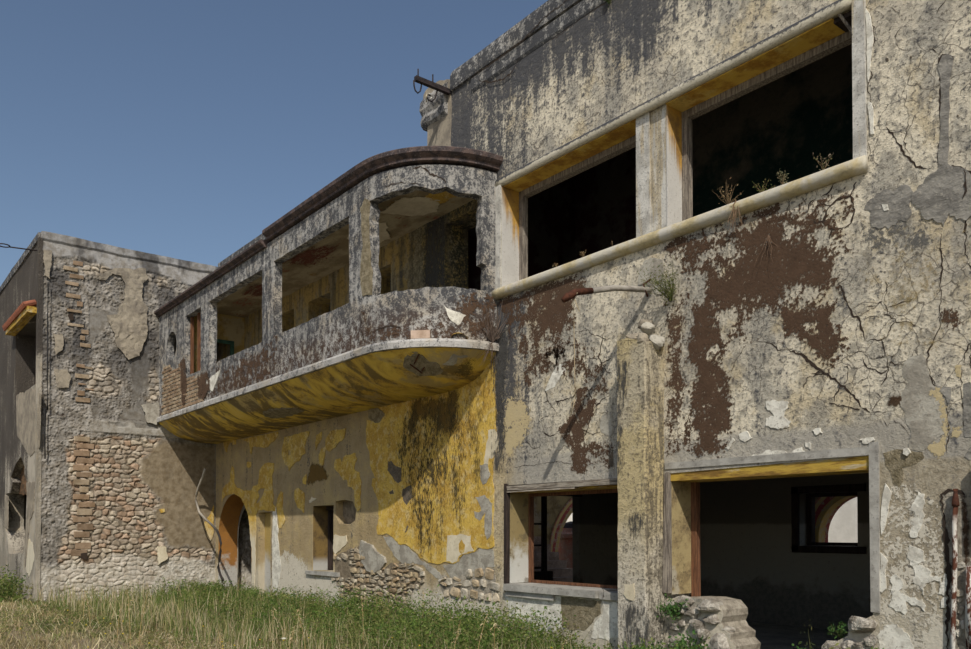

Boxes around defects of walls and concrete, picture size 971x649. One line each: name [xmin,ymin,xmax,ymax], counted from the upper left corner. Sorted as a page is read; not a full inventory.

crack [766,182,856,239]
flaking render [63,260,91,348]
crack [728,221,971,435]
flaking render [71,436,95,560]
peeling [204,359,498,592]
water stain [396,329,512,556]
peeling [889,492,947,615]
crack [946,343,971,452]
rust [961,496,970,565]